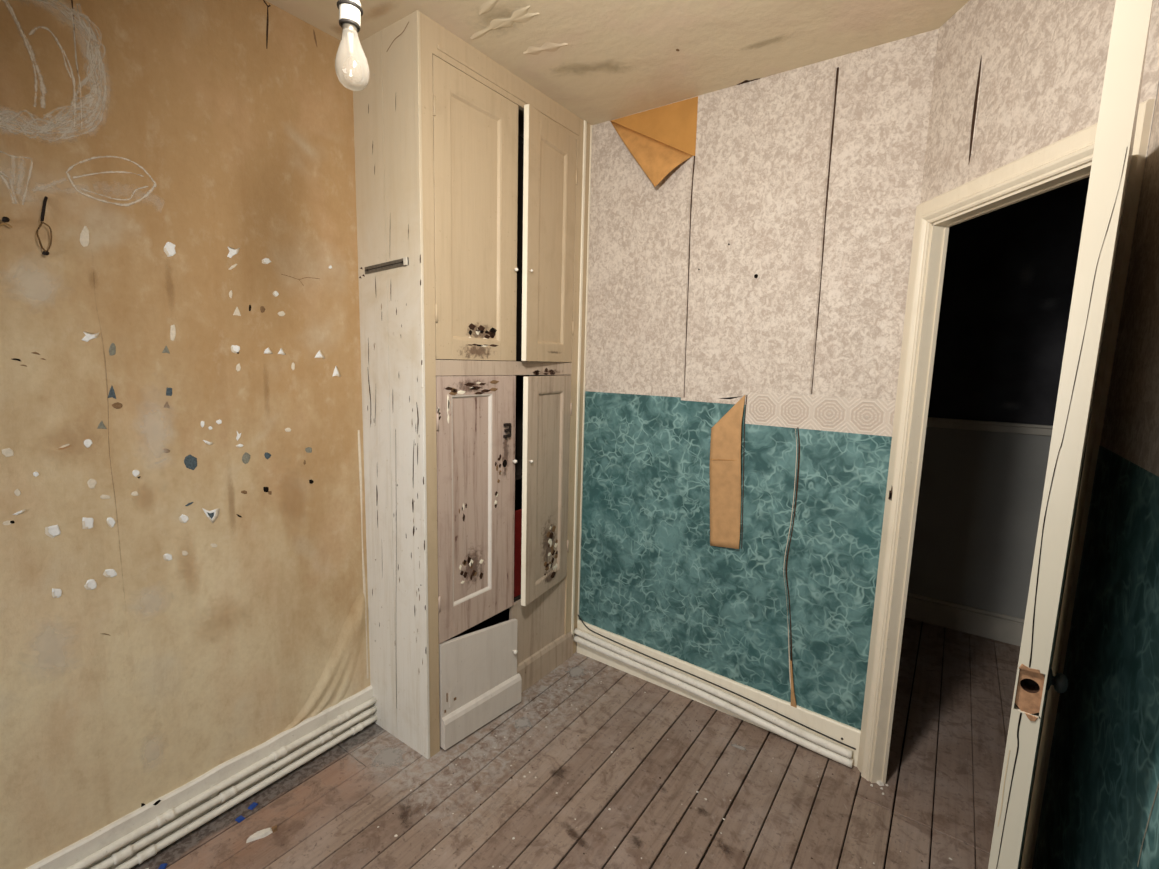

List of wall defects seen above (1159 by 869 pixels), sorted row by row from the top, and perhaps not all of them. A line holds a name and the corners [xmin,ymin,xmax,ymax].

peeling [470,0,539,40]
peeling [610,96,698,156]
flaking render [164,242,176,257]
flaking render [162,325,176,354]
flaking render [315,350,341,377]
peeling [236,432,250,464]
peeling [184,455,197,470]
peeling [710,395,747,549]
flaking render [45,525,61,538]
flaking render [82,517,116,529]
flaking render [179,502,220,523]
flaking render [84,569,117,590]